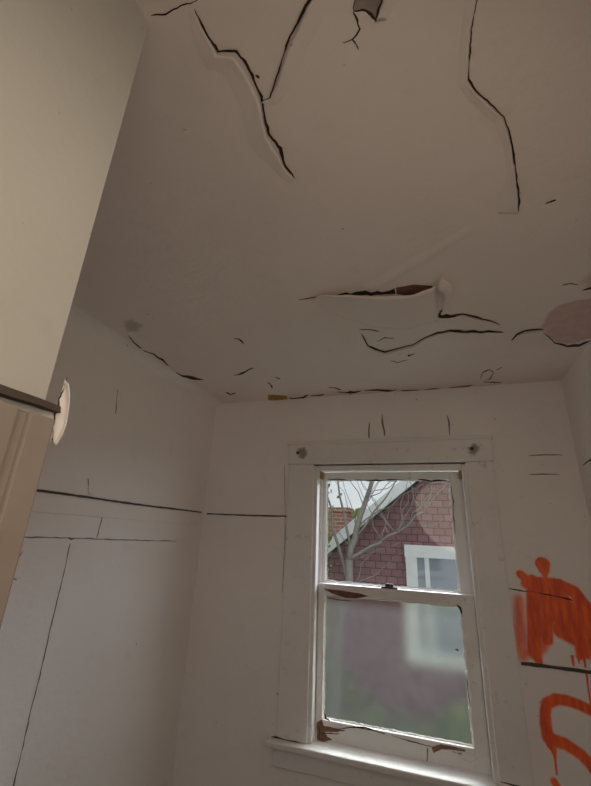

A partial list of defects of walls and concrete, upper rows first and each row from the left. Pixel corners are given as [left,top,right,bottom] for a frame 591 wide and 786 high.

crack [343,12,361,50]
peeling [351,0,398,24]
crack [151,0,328,184]
crack [459,0,521,214]
crack [128,335,203,380]
peeling [299,273,453,330]
crack [359,313,544,363]
peeling [537,297,591,347]
peeling [41,378,70,445]
peeling [316,719,346,742]